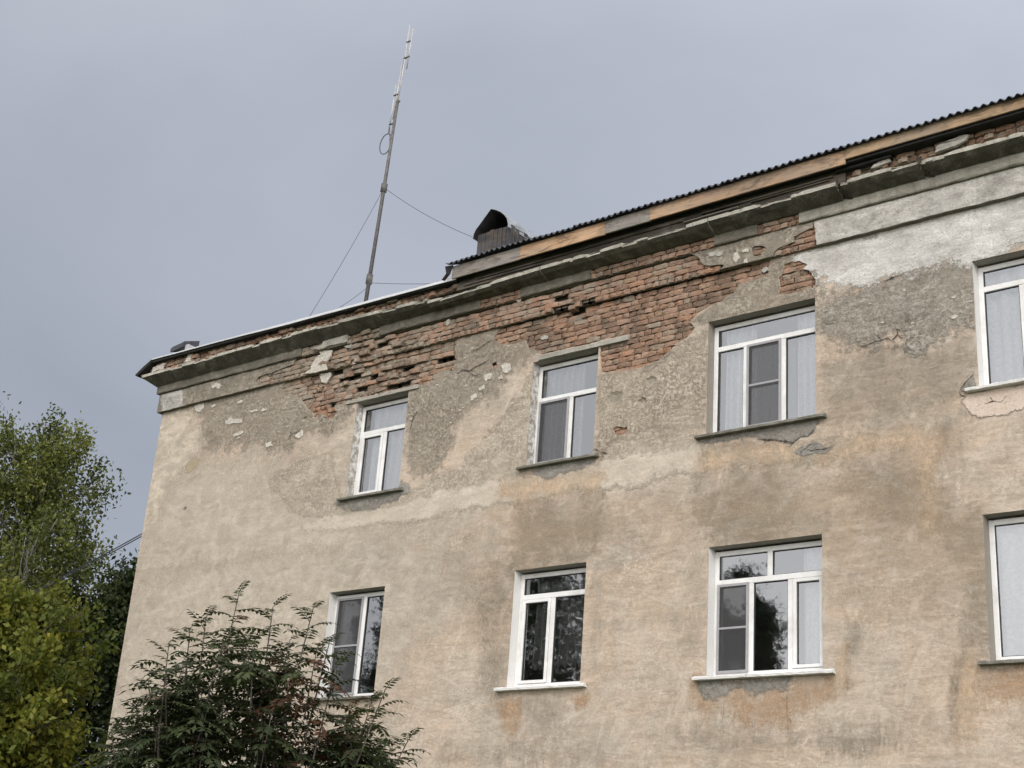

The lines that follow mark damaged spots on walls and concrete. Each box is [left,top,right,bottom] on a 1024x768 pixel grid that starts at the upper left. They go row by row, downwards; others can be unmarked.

flaking render [142,166,1024,539]